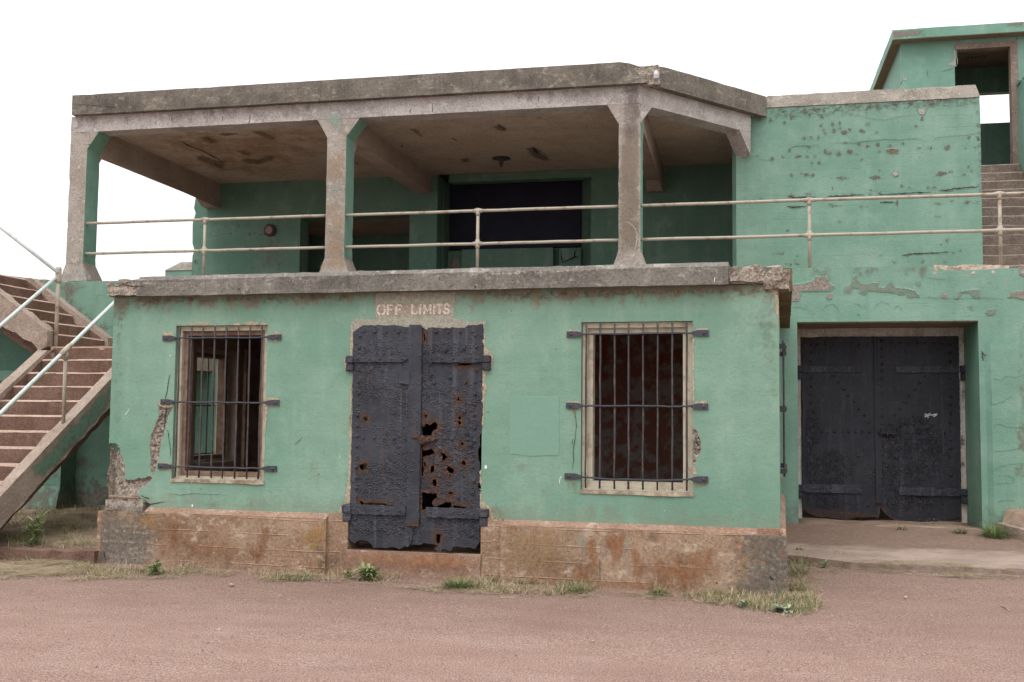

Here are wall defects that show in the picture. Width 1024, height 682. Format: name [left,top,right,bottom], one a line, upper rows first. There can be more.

spalling [756,104,950,177]
peeling [861,166,978,217]
peeling [758,238,1024,325]
peeling [692,328,708,404]
spalling [105,399,173,512]
spalling [692,428,701,474]